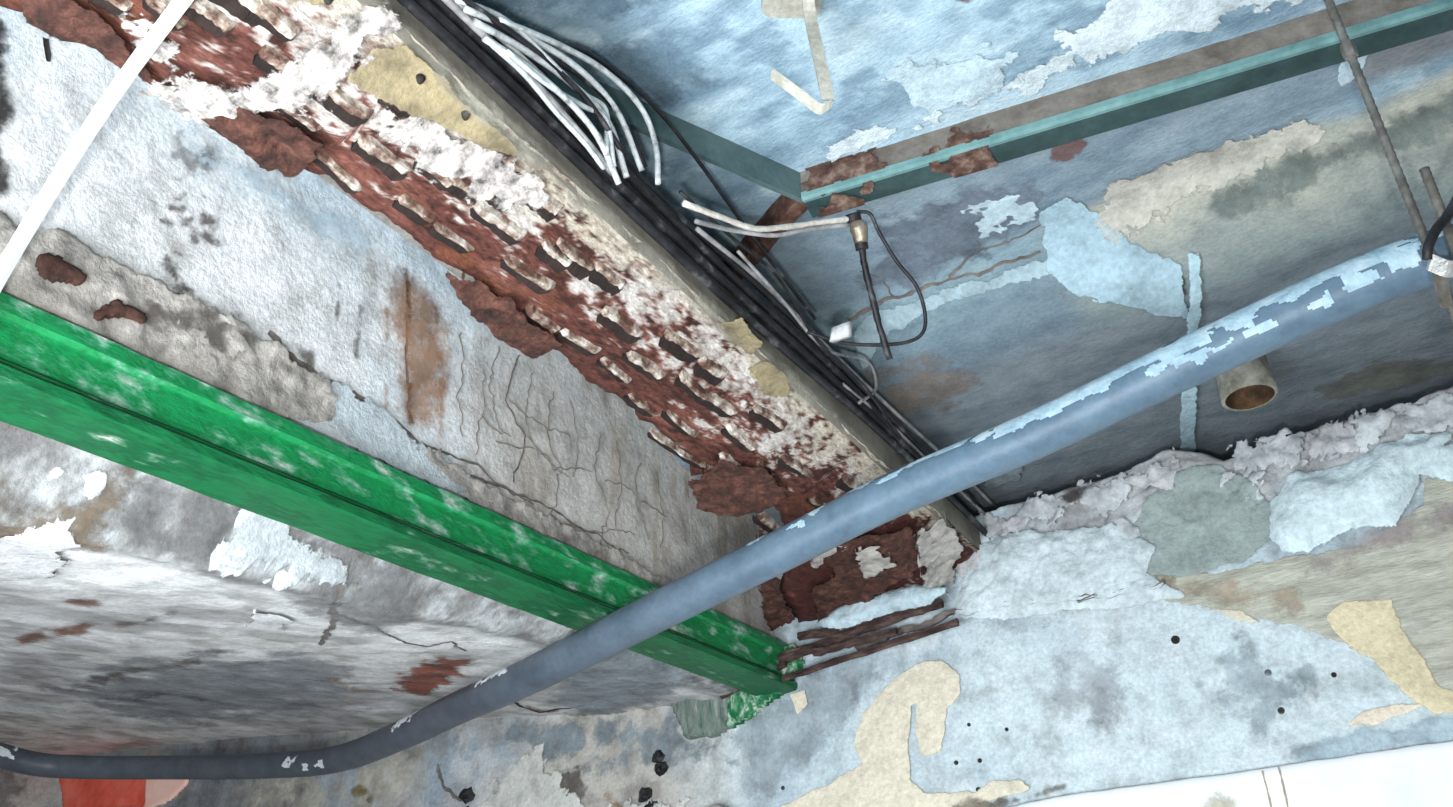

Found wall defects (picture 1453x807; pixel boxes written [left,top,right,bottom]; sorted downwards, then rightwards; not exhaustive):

corrosion [20,0,153,85]
corrosion [198,107,324,178]
corrosion [446,270,562,359]
flaking render [0,211,671,591]
crack [268,281,667,554]
flaking render [246,610,293,631]
corrosion [758,577,795,631]
flaking render [811,534,897,580]
corrosion [810,521,918,621]
flaking render [914,391,1453,691]
water stain [75,651,224,702]
corrosion [329,658,474,696]